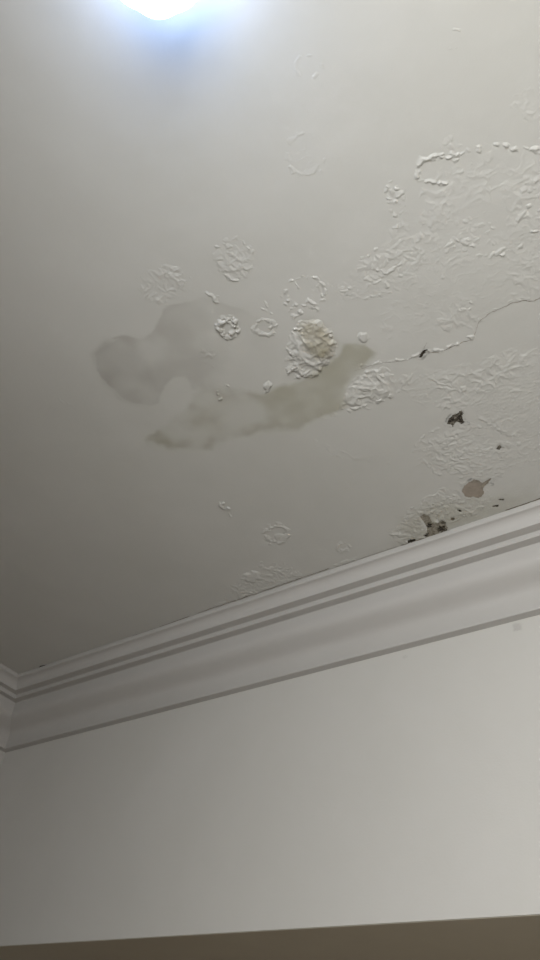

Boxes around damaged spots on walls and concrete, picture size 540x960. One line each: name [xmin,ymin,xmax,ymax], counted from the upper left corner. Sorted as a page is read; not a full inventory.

crack [359,295,538,368]
spalling [447,410,470,427]
peeling [387,477,507,546]